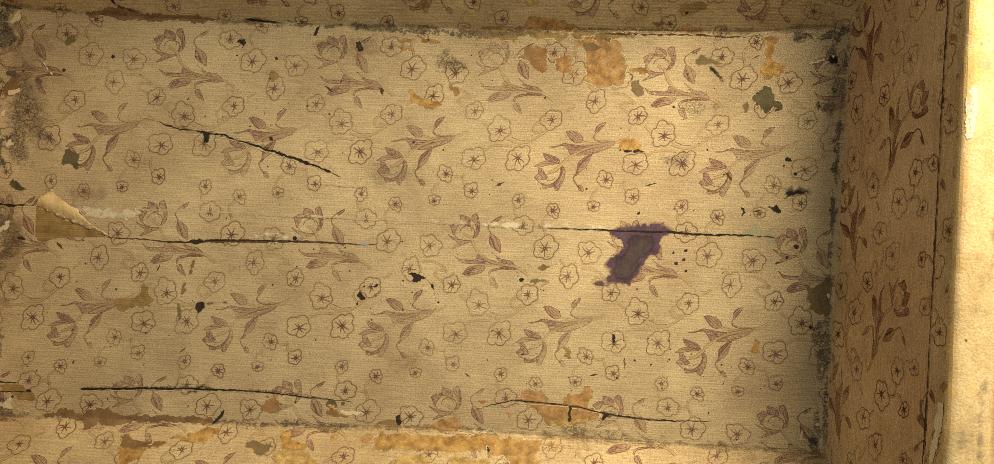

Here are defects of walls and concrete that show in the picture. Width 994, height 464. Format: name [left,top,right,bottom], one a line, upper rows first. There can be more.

water stain [0,8,17,47]
crack [146,118,365,190]
peeling [35,189,111,237]
crack [108,237,374,246]
crack [81,385,351,402]
crack [478,399,707,422]
water stain [246,441,271,456]